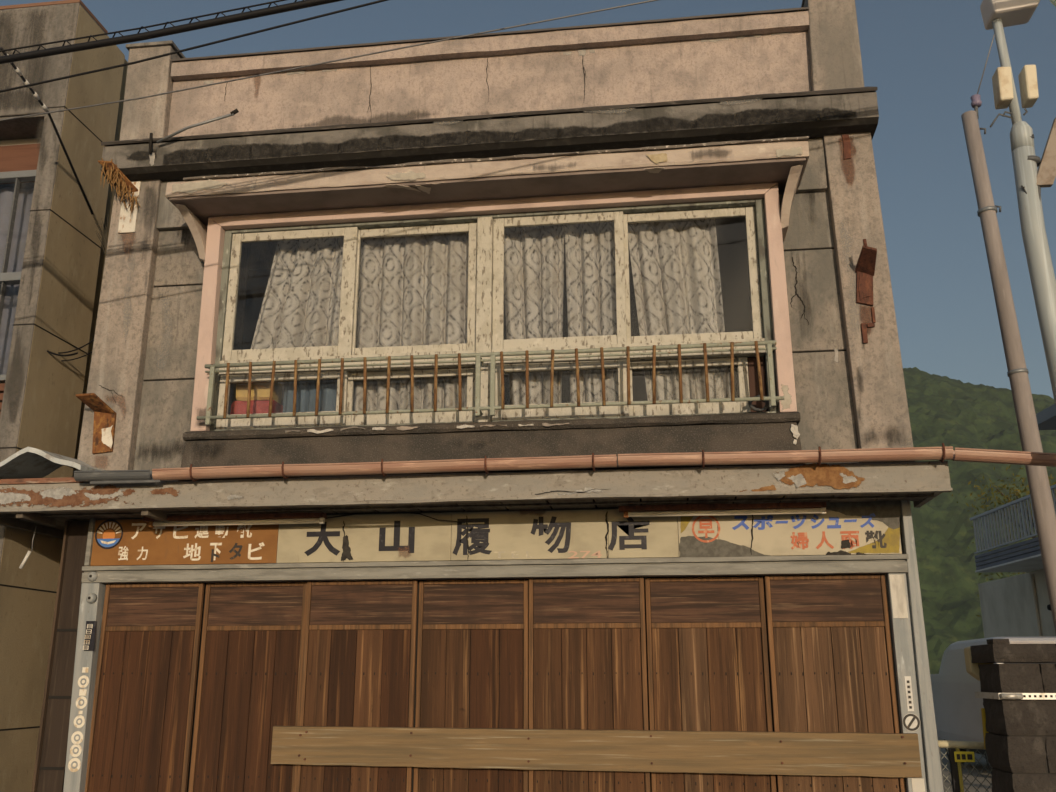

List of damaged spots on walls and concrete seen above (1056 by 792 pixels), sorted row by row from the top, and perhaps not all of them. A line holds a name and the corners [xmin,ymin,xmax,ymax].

water stain [127,108,856,166]
peeling [0,484,135,508]